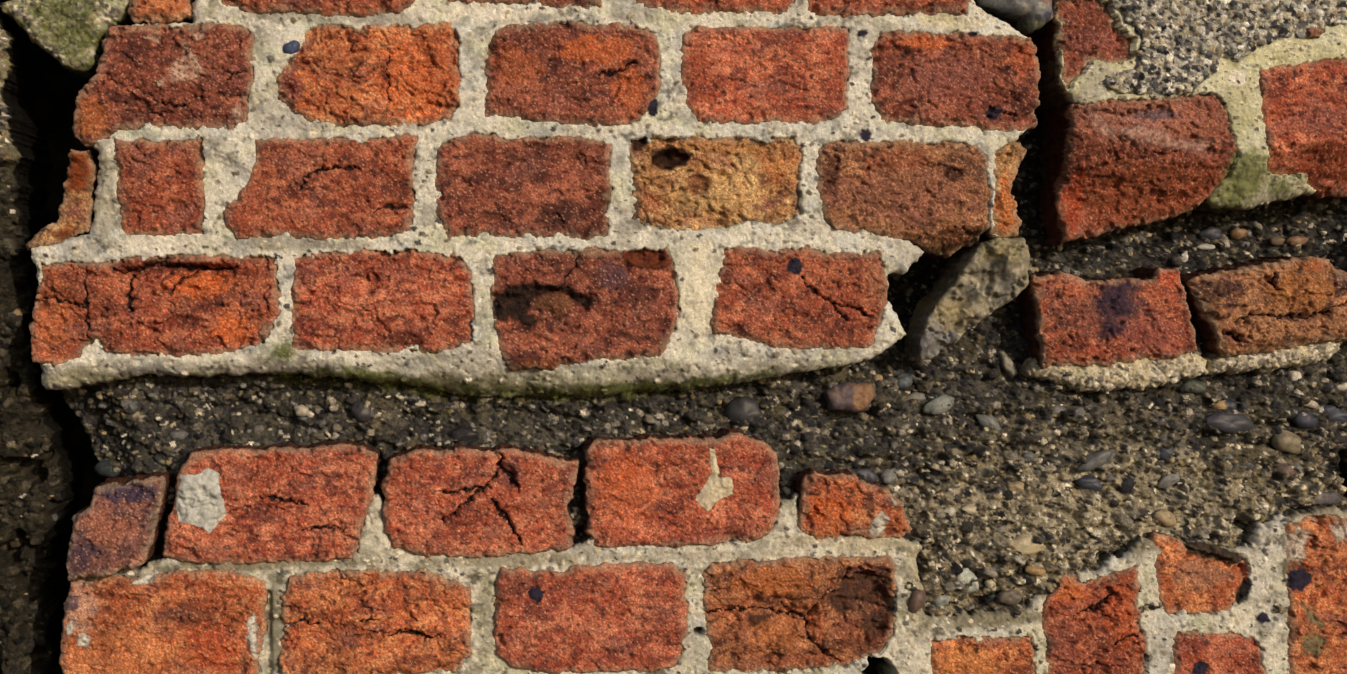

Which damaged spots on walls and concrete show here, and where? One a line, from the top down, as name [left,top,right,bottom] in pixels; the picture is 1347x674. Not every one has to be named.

spalling [1306,27,1326,39]
crack [801,276,876,320]
crack [440,453,522,544]
spalling [1179,537,1248,564]
spalling [748,614,773,625]
spalling [830,567,892,639]